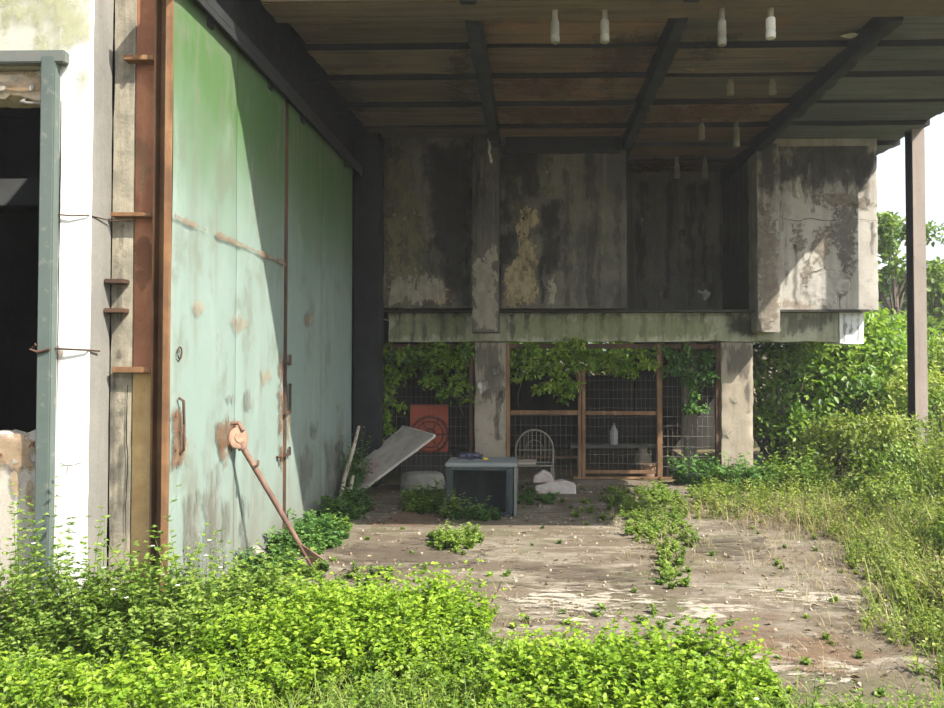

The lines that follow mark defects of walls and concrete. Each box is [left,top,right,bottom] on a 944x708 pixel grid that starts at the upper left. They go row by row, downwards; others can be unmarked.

damp [422,143,472,305]
damp [487,139,540,263]
spalling [472,175,557,332]
damp [538,200,563,303]
damp [759,143,877,198]
crack [782,209,874,272]
spalling [0,434,36,472]
corrosion [171,407,187,469]
corrosion [217,418,236,466]